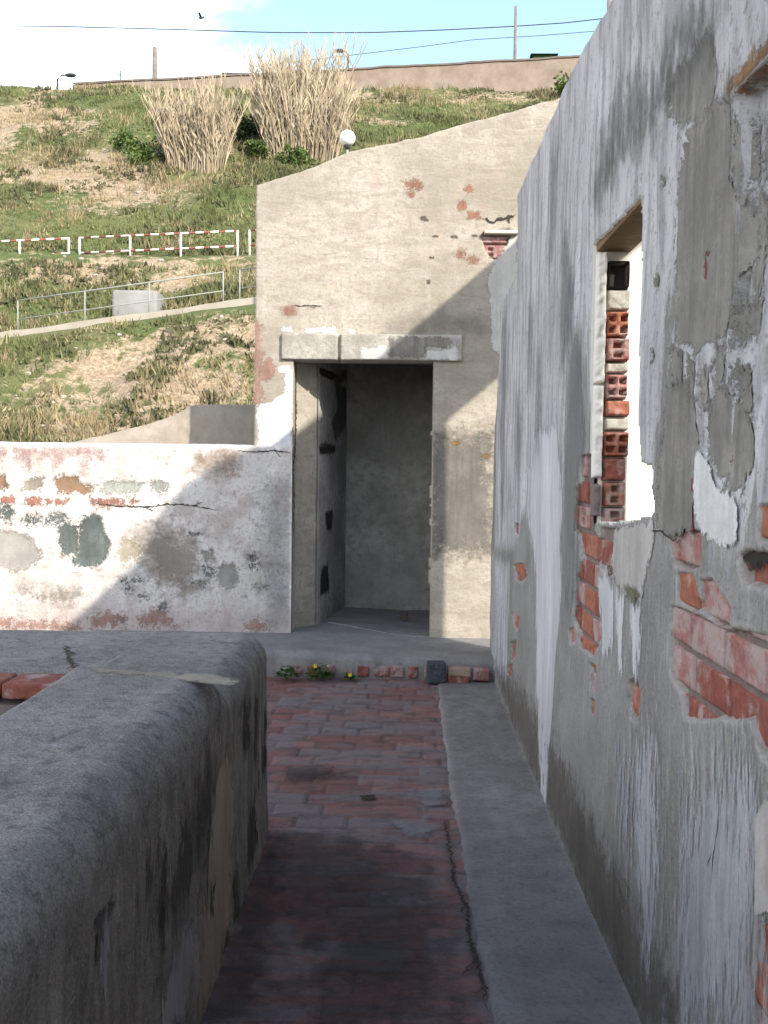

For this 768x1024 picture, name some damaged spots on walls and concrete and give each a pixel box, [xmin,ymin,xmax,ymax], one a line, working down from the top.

water stain [599,1,713,186]
flaking render [402,176,422,198]
crack [485,215,514,223]
flaking render [0,471,171,572]
crack [92,501,212,511]
crack [239,380,298,532]
peeling [250,319,293,446]
flaking render [571,455,614,714]
flaking render [650,25,768,747]
water stain [146,761,221,935]
water stain [242,696,267,872]
crack [443,816,489,1012]